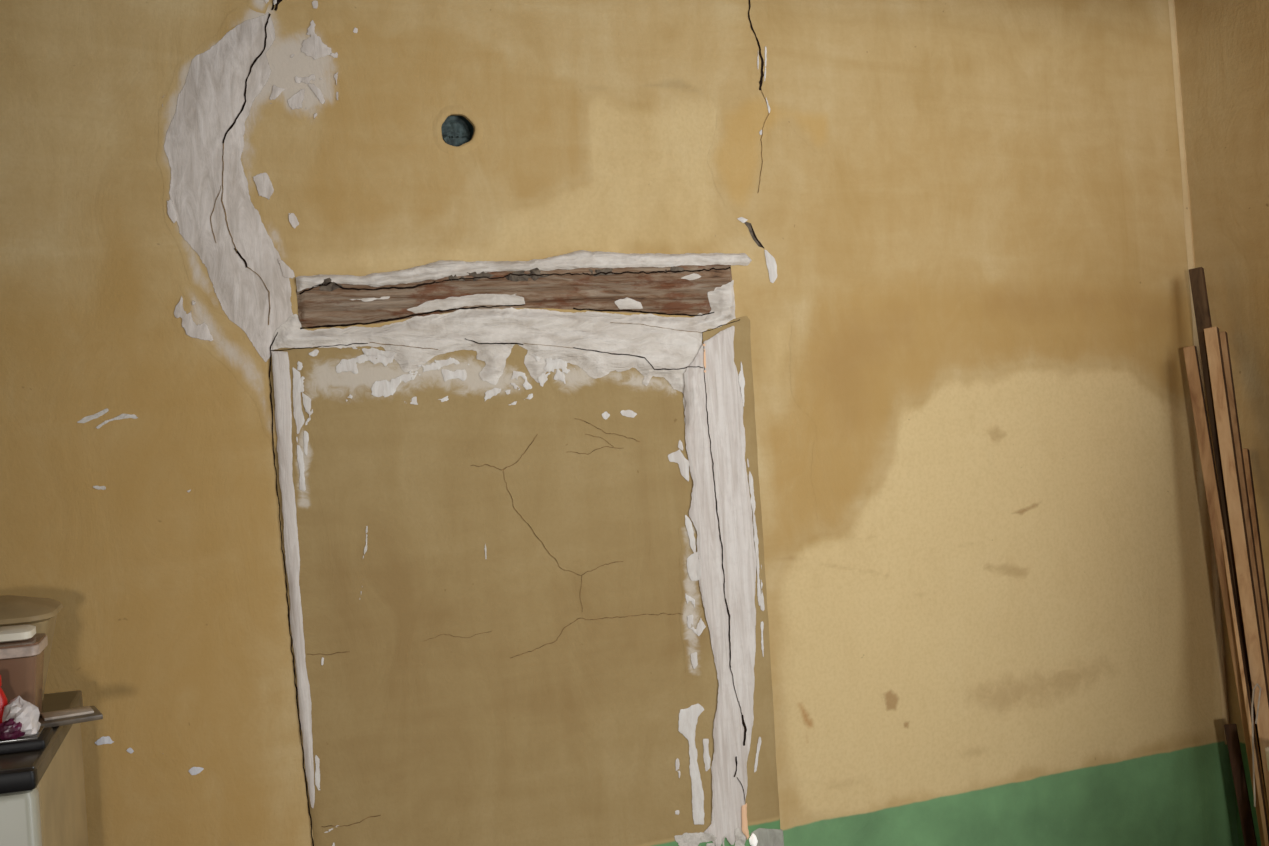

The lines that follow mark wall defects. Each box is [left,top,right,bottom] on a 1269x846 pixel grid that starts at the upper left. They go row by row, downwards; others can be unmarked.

flaking render [157,0,765,846]
crack [210,0,747,846]
crack [748,0,770,192]